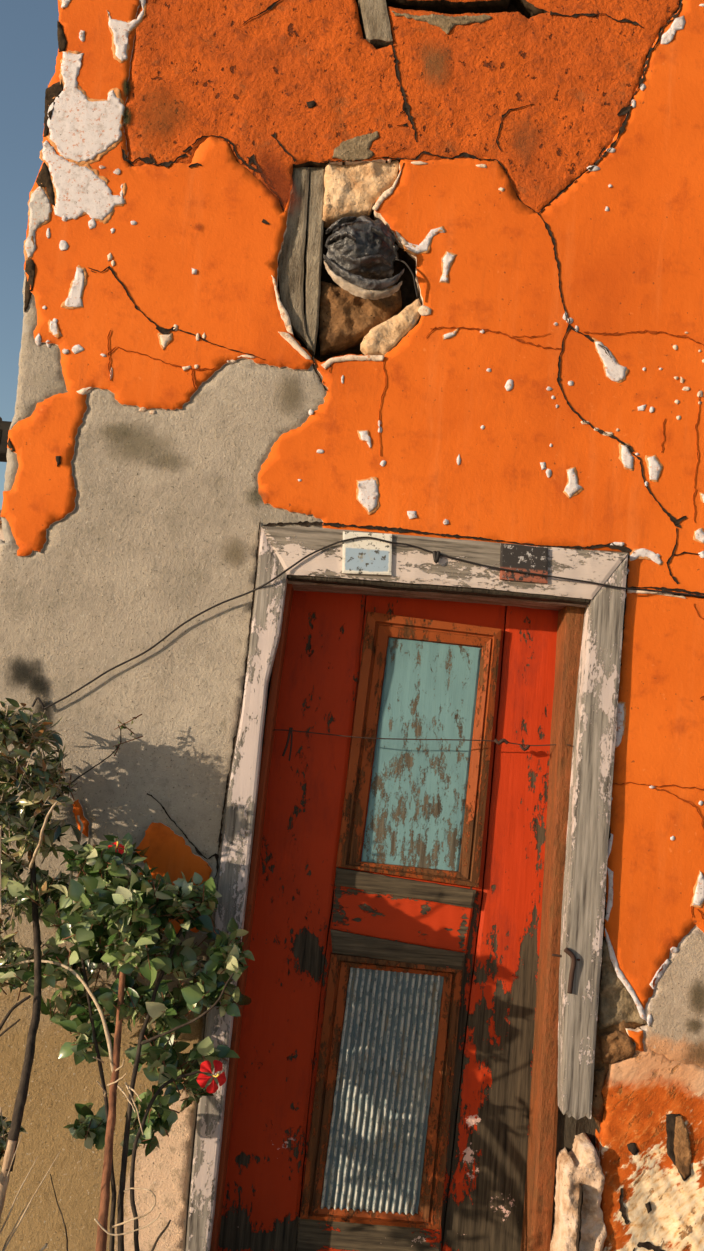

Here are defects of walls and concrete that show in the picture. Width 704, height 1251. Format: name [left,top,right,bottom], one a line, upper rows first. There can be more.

crack [89,266,266,389]
peeling [0,0,679,891]
crack [121,0,704,880]
peeling [592,338,703,420]
damp [10,660,51,728]
peeling [0,905,216,1251]
crack [598,815,611,1004]
peeling [591,834,704,1133]